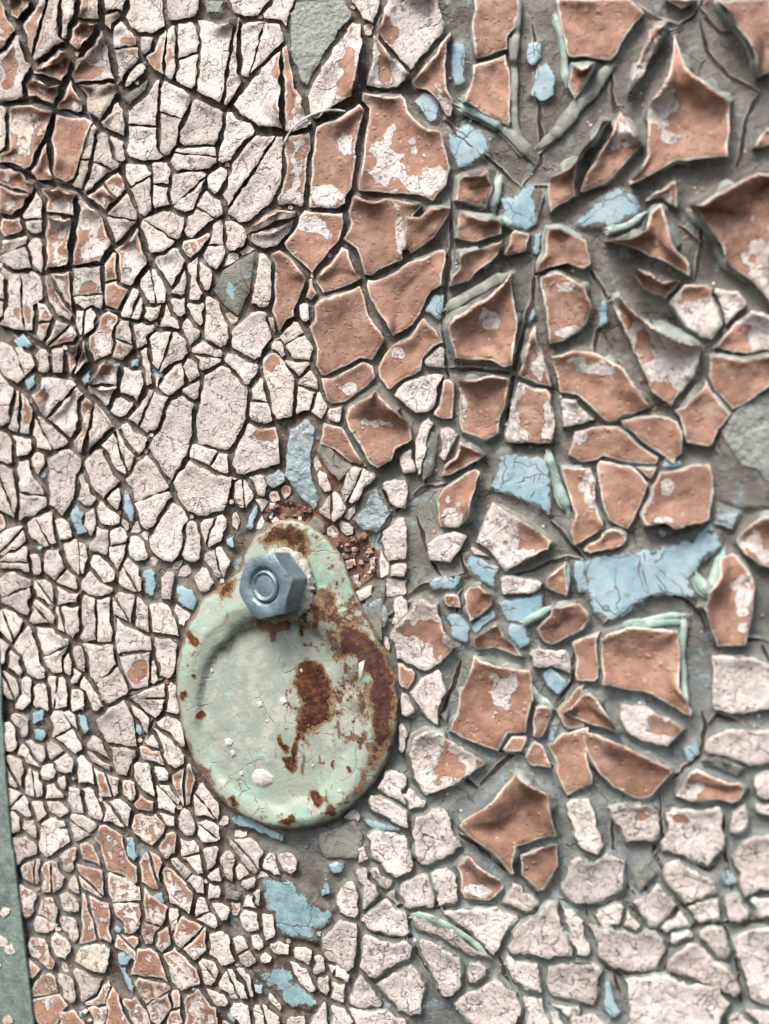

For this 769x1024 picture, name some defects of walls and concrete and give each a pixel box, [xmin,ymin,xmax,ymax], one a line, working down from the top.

peeling [666,0,769,79]
peeling [533,20,734,343]
crack [0,262,105,278]
crack [0,309,171,357]
peeling [0,169,769,599]
crack [439,197,540,439]
rust [255,618,307,643]
rust [309,790,324,808]
rust [316,585,337,616]
rust [276,620,398,796]
peeling [261,489,769,1024]
crack [551,710,769,1014]